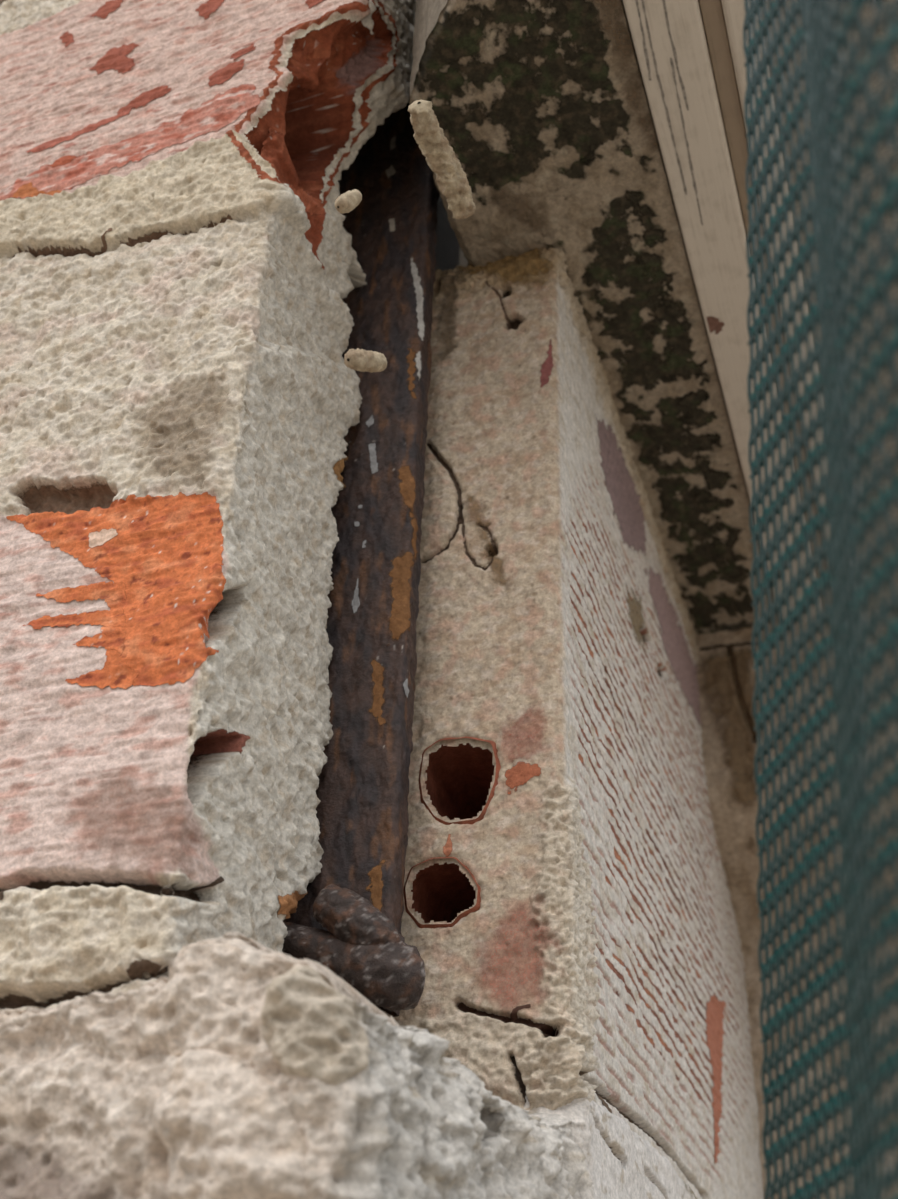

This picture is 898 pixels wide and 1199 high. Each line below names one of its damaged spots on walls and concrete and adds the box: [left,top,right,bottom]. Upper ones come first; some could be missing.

spalling [0,0,400,269]
damp [414,0,658,357]
damp [410,258,425,379]
peeling [6,492,226,689]
corrosion [389,465,418,640]
damp [576,190,763,806]
corrosion [368,659,386,726]
damp [504,712,541,794]
corrosion [277,891,308,919]
corrosion [366,859,385,911]
crack [457,1003,558,1037]
crack [510,1056,529,1103]